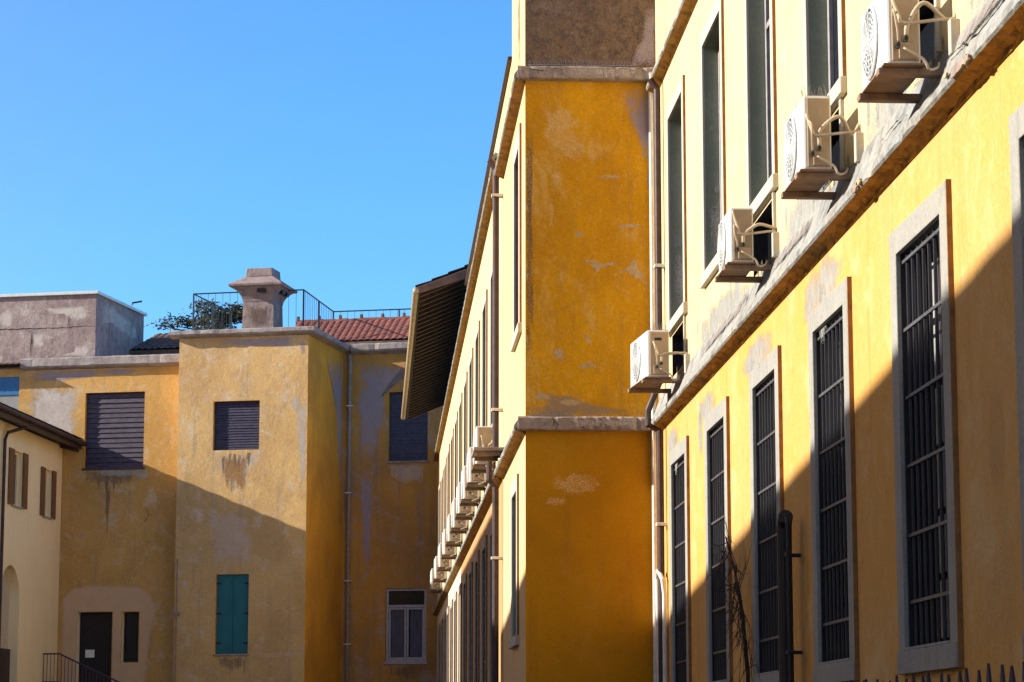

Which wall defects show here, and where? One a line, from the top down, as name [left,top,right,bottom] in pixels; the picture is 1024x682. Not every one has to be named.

damp [85,469,149,532]